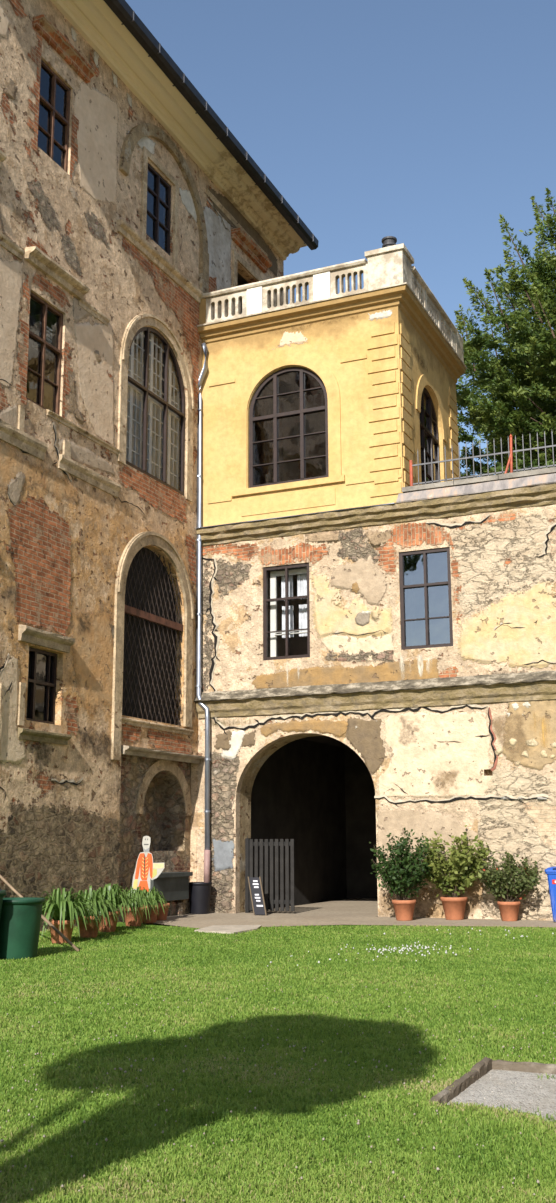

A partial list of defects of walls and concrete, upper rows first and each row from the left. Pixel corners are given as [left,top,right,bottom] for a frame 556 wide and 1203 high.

flaking render [203,187,284,303]
flaking render [0,82,259,736]
flaking render [252,512,556,689]
crack [536,523,556,557]
flaking render [0,656,26,765]
crack [201,558,548,805]
flaking render [0,802,121,931]